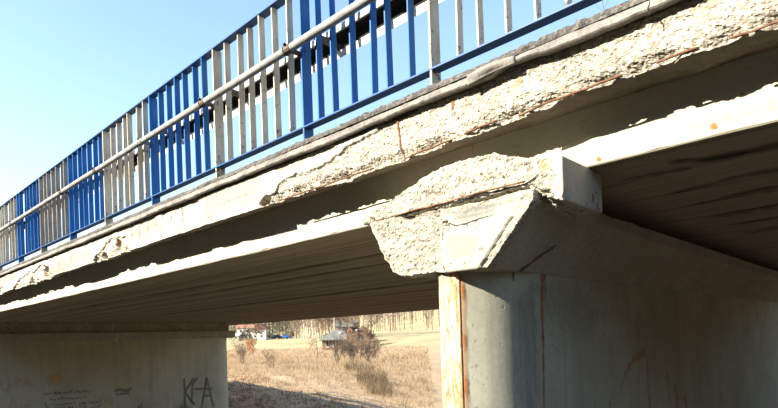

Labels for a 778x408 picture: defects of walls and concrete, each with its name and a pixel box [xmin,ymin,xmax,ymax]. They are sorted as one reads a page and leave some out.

spalling [261,0,778,208]
spalling [0,265,52,295]
spalling [92,199,201,262]
corrosion [460,276,468,408]
spalling [362,152,595,279]